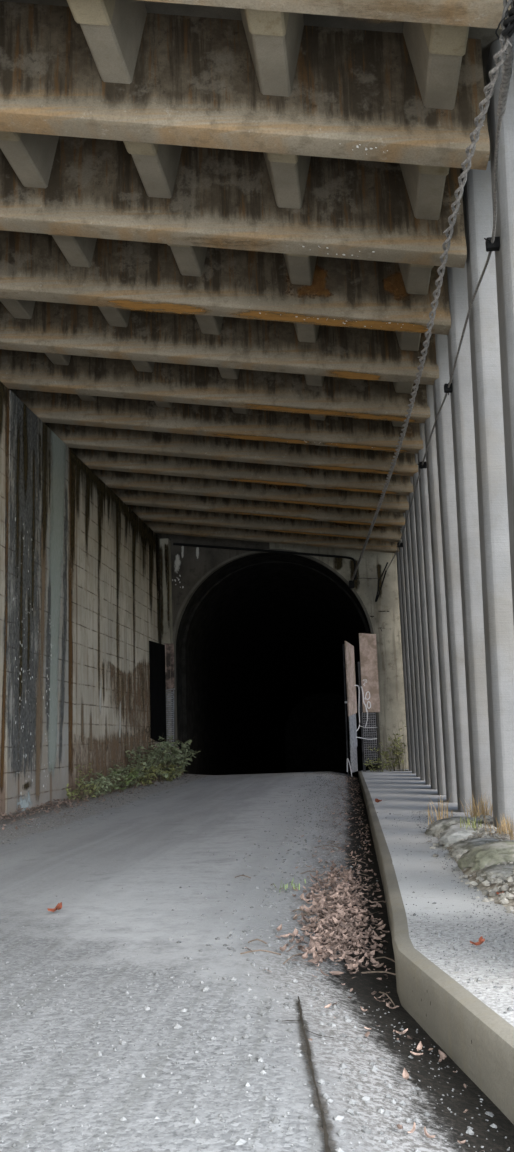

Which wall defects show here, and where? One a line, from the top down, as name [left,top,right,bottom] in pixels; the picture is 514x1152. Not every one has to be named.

damp [0,382,199,811]